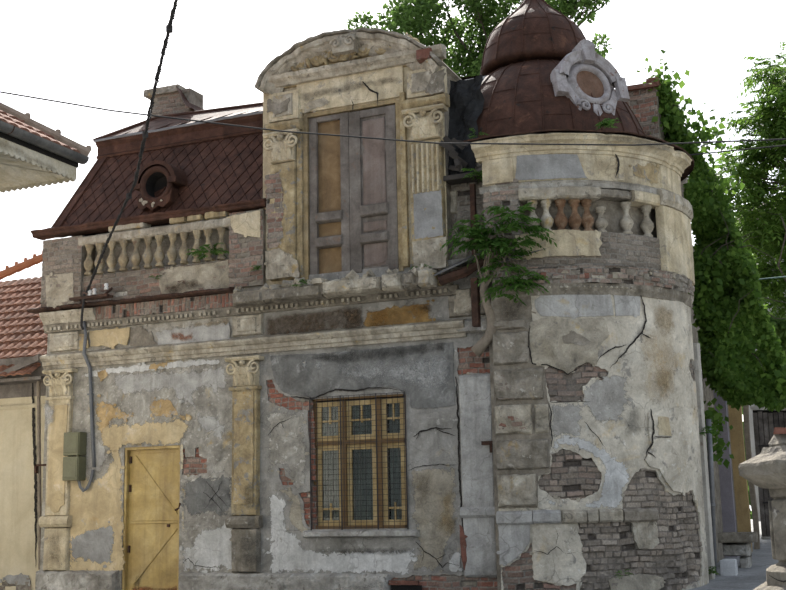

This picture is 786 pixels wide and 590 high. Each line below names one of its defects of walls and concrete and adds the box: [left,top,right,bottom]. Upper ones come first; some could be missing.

crack [291,387,402,400]
flaking render [458,346,490,375]
flaking render [536,362,608,402]
crack [528,295,652,375]
peeling [69,394,207,574]
flaking render [267,380,317,529]
crack [411,377,463,527]
flaking render [538,449,602,502]
crack [644,409,670,460]
flaking render [335,468,703,590]